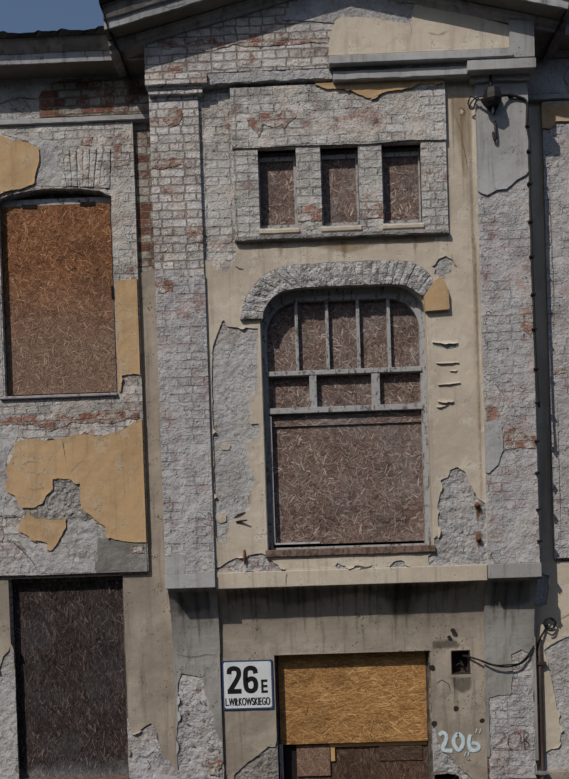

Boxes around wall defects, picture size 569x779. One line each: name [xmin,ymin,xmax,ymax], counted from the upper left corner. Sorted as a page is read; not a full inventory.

peeling [316,79,444,99]
peeling [0,133,64,195]
peeling [212,321,259,542]
spalling [553,394,569,487]
peeling [0,409,147,576]
peeling [216,553,286,573]
peeling [428,467,487,566]
peeling [0,644,19,779]
peeling [127,673,224,779]
spalling [234,746,279,779]
peeling [480,637,569,779]